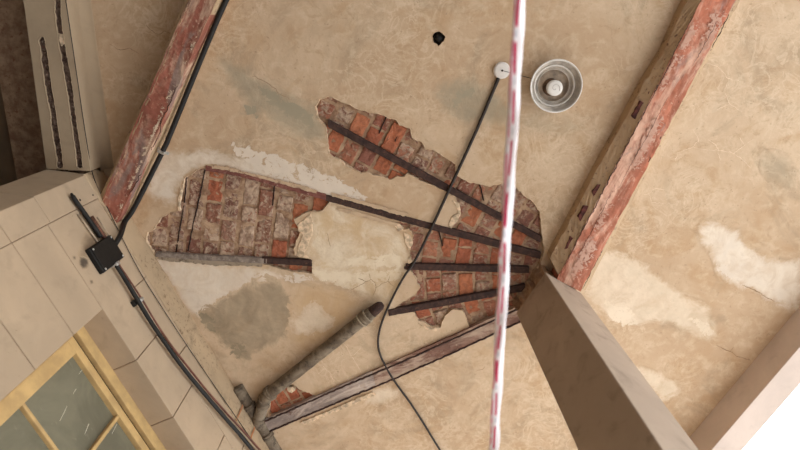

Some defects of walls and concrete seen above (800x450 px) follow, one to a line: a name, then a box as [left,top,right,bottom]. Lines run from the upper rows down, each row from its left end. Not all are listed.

spalling [38,0,86,172]
spalling [145,97,545,331]
damp [198,272,361,363]
spalling [268,384,316,416]
rust [264,319,495,432]